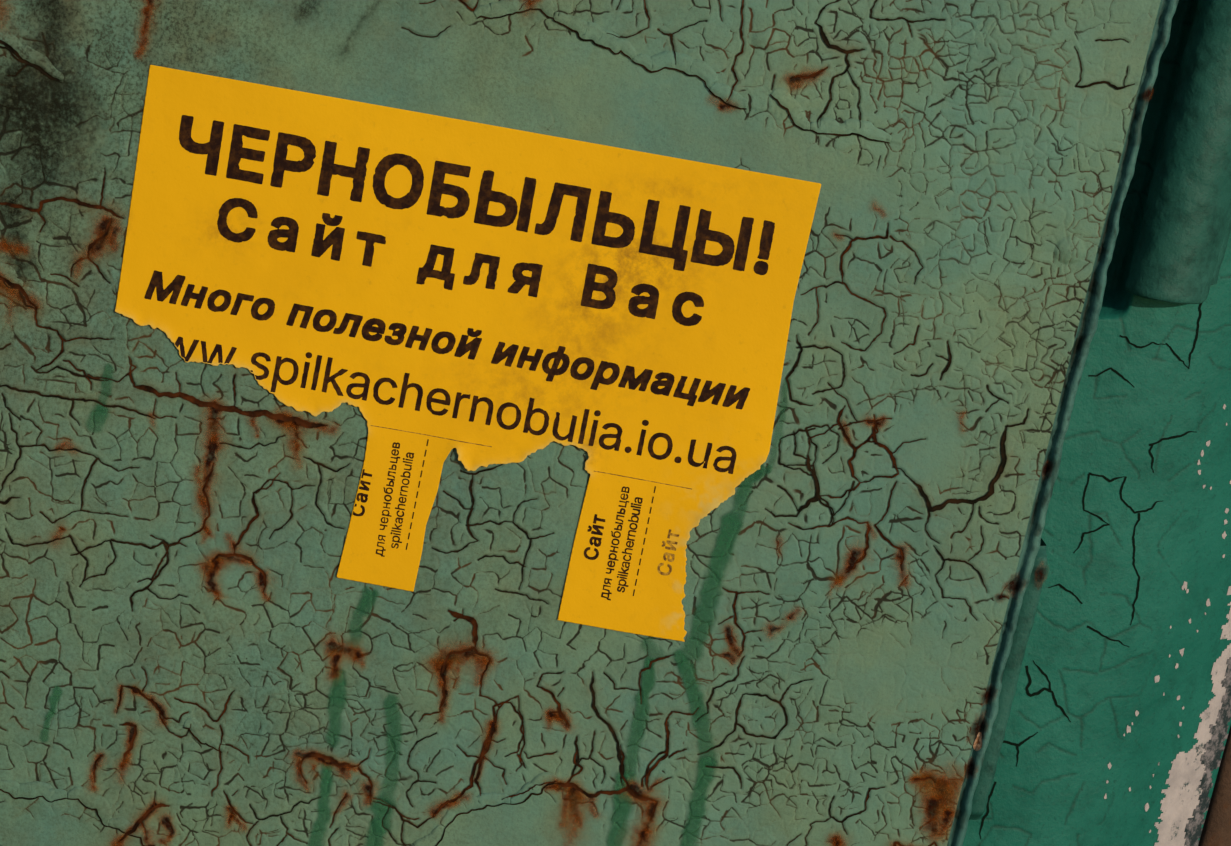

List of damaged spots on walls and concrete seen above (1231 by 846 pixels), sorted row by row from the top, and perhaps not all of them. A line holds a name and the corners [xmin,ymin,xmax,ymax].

crack [771,0,865,128]
crack [0,276,349,612]
rust [196,400,222,540]
rust [202,536,269,600]
crack [432,465,554,604]
crack [765,225,1029,620]
crack [1048,431,1194,647]
rust [327,638,364,678]
crack [93,588,813,846]
rust [431,645,493,722]
peeling [1145,586,1231,846]
rust [910,761,974,840]